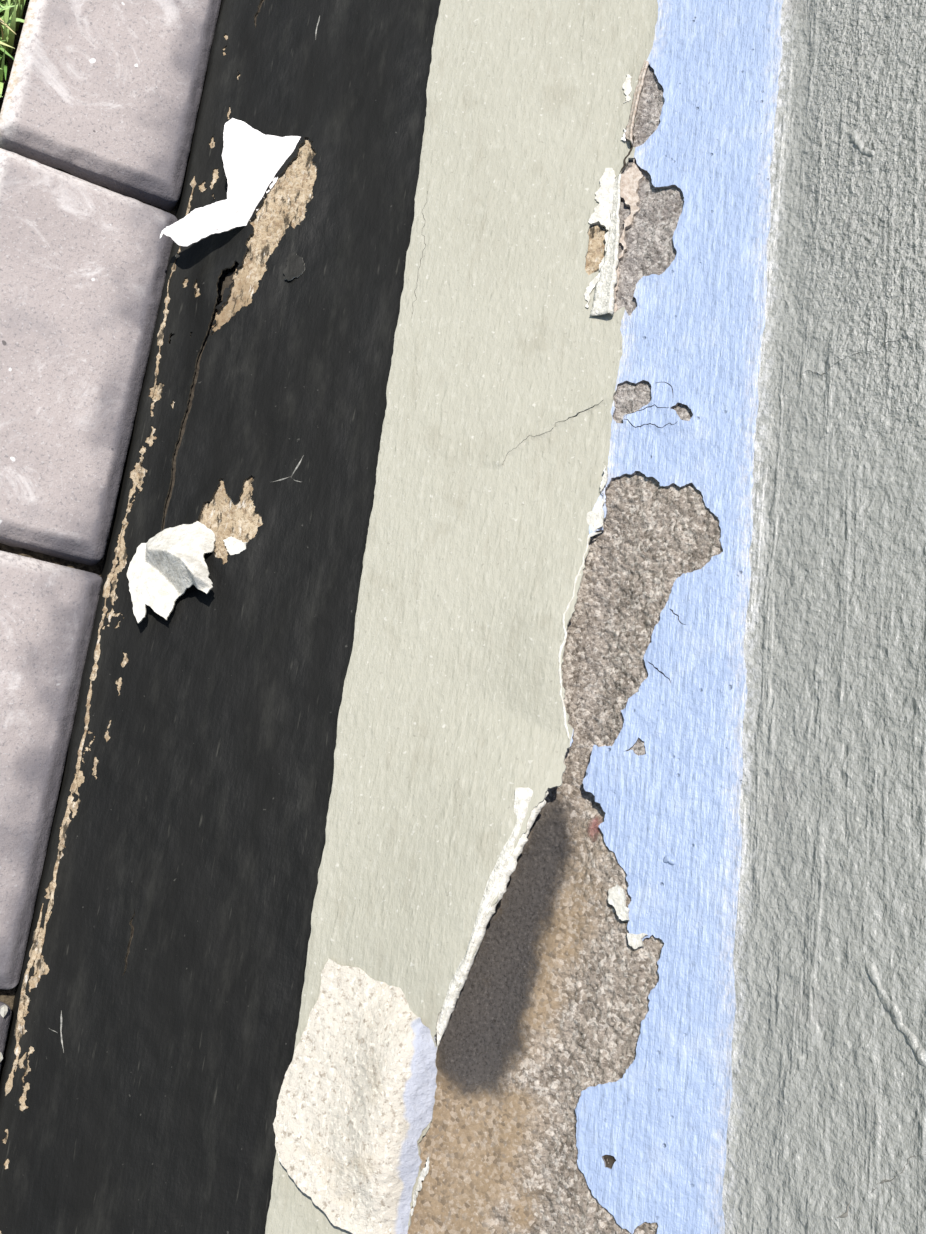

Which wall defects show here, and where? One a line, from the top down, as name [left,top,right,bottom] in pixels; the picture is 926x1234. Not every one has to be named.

peeling [584,60,684,316]
spalling [613,382,658,427]
spalling [673,404,693,421]
peeling [5,107,318,1111]
spalling [273,465,723,1234]